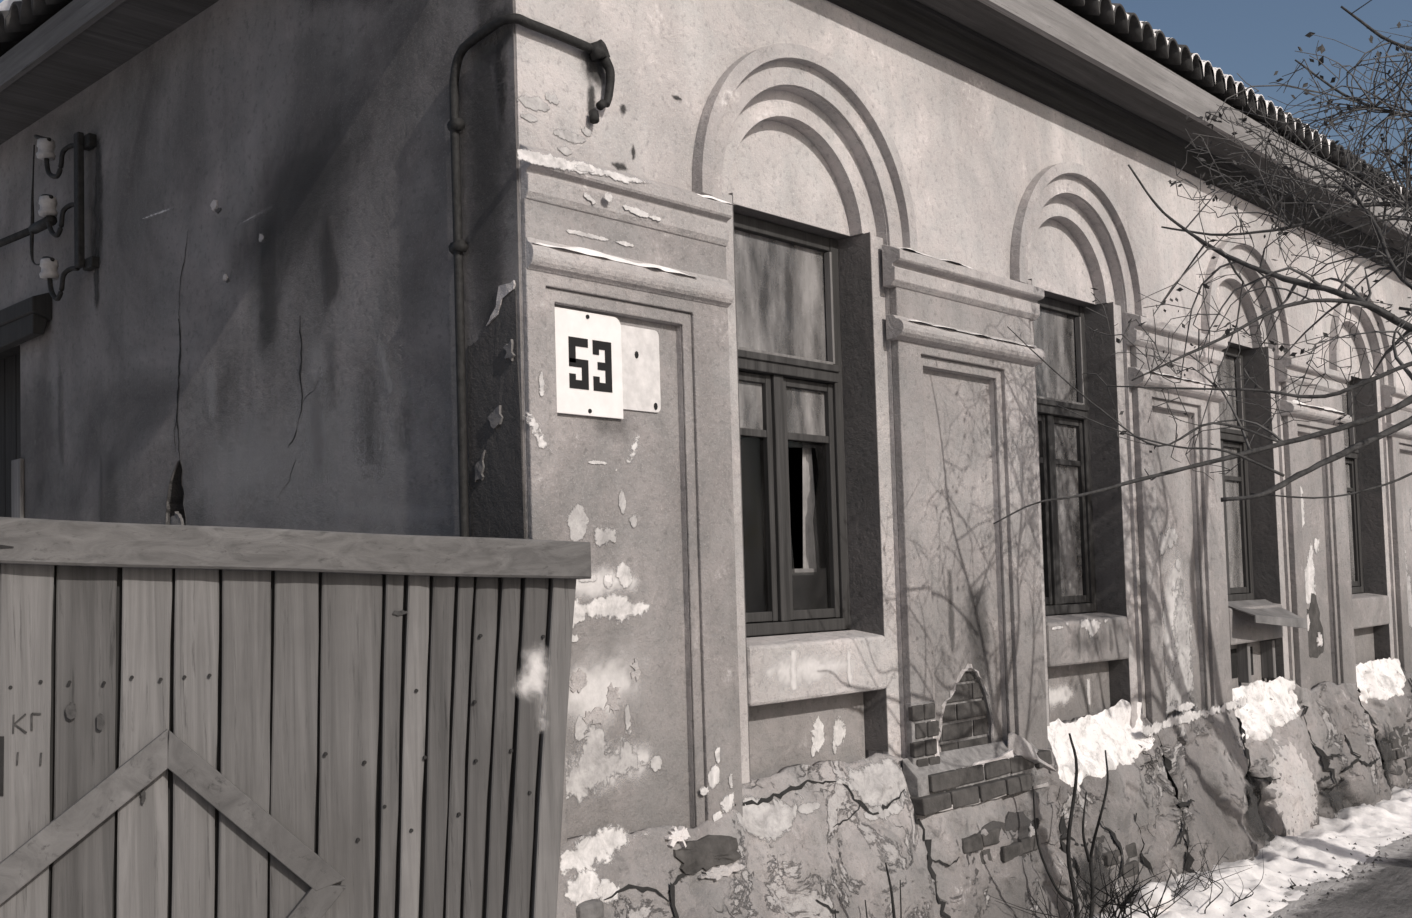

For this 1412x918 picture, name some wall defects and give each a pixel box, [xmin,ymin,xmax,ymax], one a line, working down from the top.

peeling [517,126,661,221]
peeling [566,229,634,247]
crack [174,233,188,461]
crack [279,328,320,495]
spalling [468,280,551,539]
peeling [566,704,662,805]
peeling [559,747,821,907]
peeling [810,715,846,758]
crack [732,779,959,918]
flaking render [835,664,1056,879]